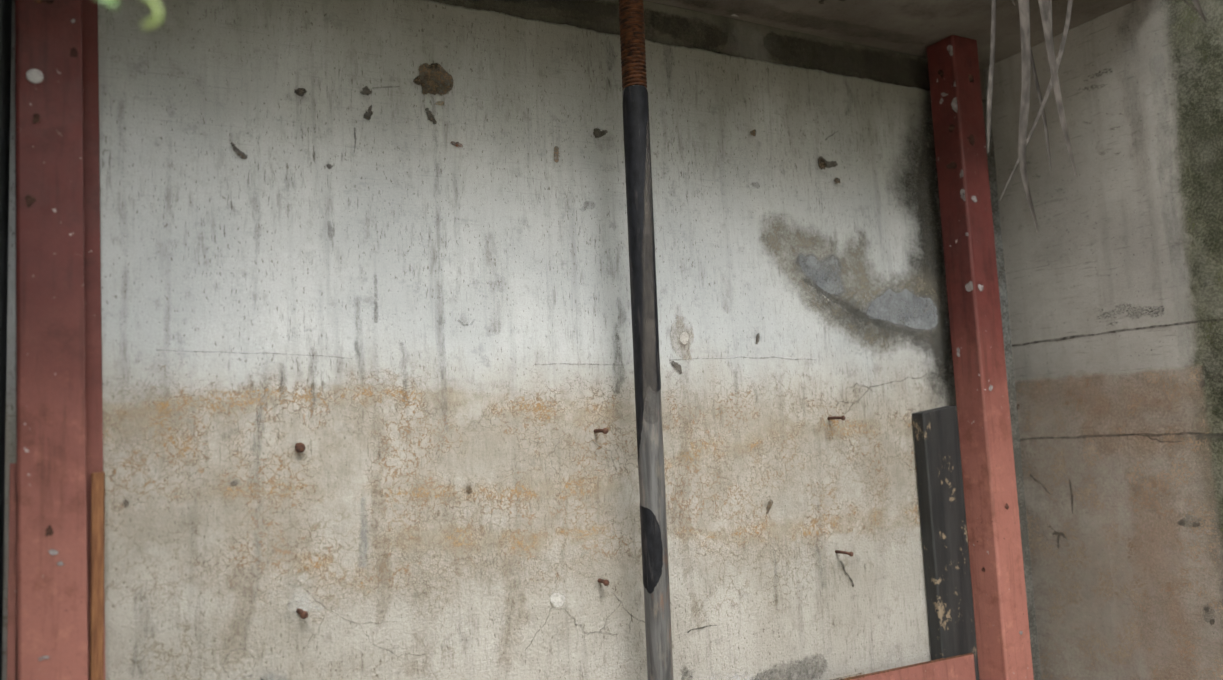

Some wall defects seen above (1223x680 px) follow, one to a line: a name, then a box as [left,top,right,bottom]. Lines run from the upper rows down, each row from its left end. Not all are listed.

damp [644,0,736,54]
peeling [940,82,958,112]
damp [763,15,955,403]
corrosion [108,372,637,595]
corrosion [664,388,921,554]
crack [550,593,565,607]